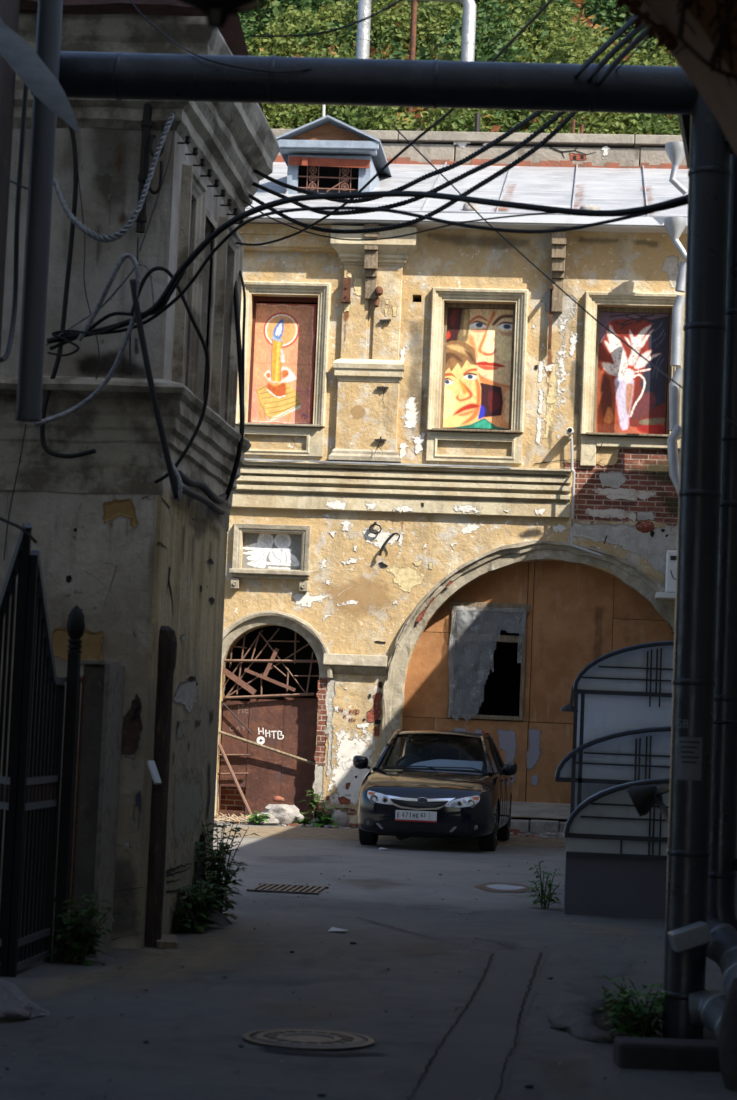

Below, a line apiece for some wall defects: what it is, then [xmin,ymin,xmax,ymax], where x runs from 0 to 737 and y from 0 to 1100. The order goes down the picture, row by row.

peeling [535,289,579,446]
peeling [399,397,425,459]
peeling [103,498,138,528]
peeling [451,504,480,549]
flaking render [535,448,680,575]
spalling [121,693,142,769]
peeling [312,677,383,815]